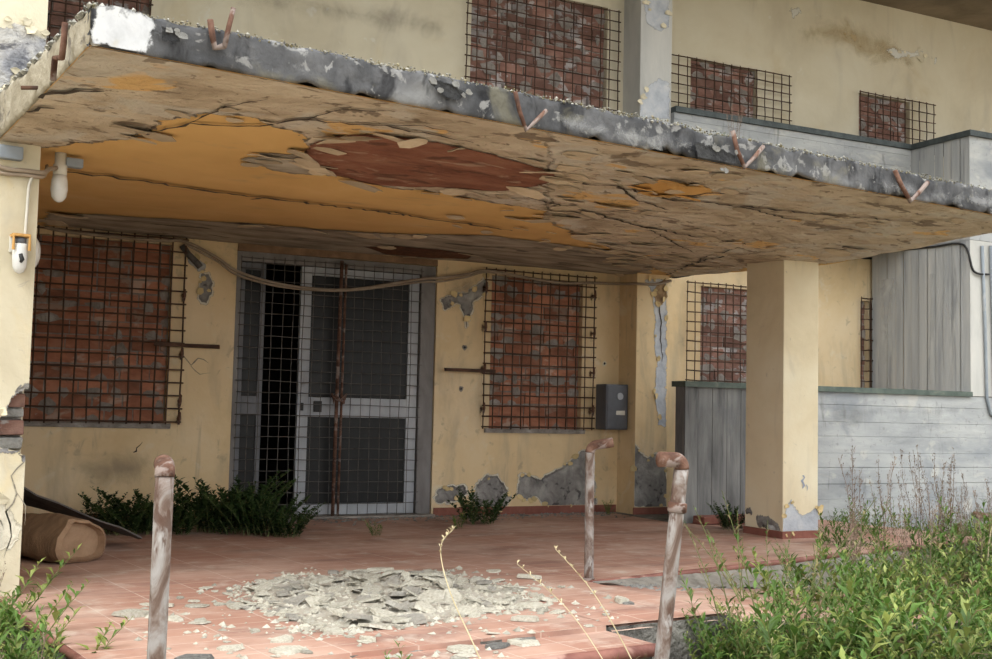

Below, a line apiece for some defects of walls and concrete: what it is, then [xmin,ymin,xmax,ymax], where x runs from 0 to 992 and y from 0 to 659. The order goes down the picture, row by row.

flaking render [0,16,50,90]
spalling [162,26,188,42]
flaking render [0,46,992,427]
crack [528,182,923,275]
spalling [0,383,29,462]
crack [0,462,26,554]
flaking render [433,449,598,512]
flaking render [630,444,669,507]
flaking render [745,500,824,537]